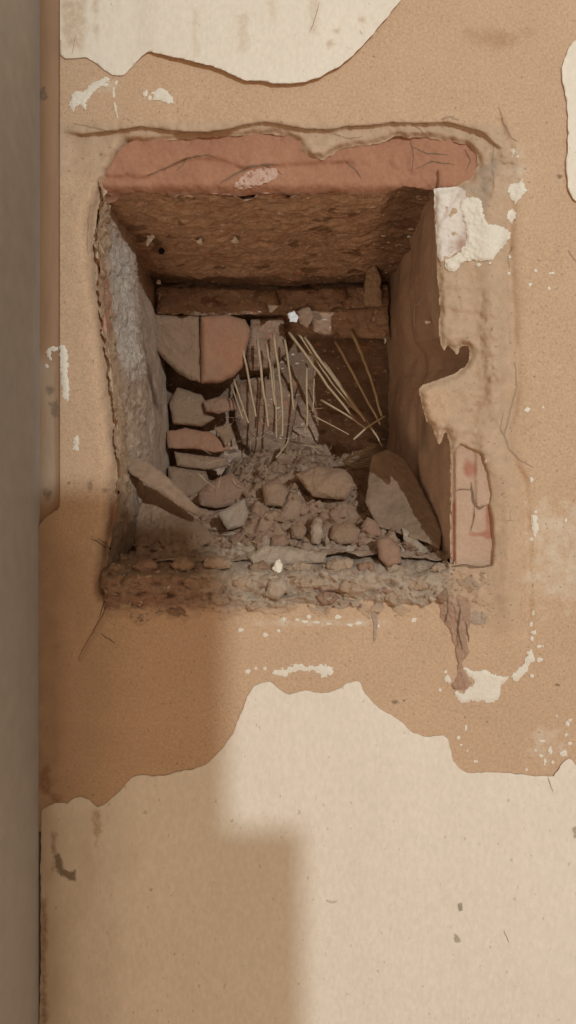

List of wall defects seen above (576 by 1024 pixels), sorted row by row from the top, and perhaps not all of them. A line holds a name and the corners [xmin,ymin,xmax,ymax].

crack [74,107,516,198]
peeling [39,0,576,831]